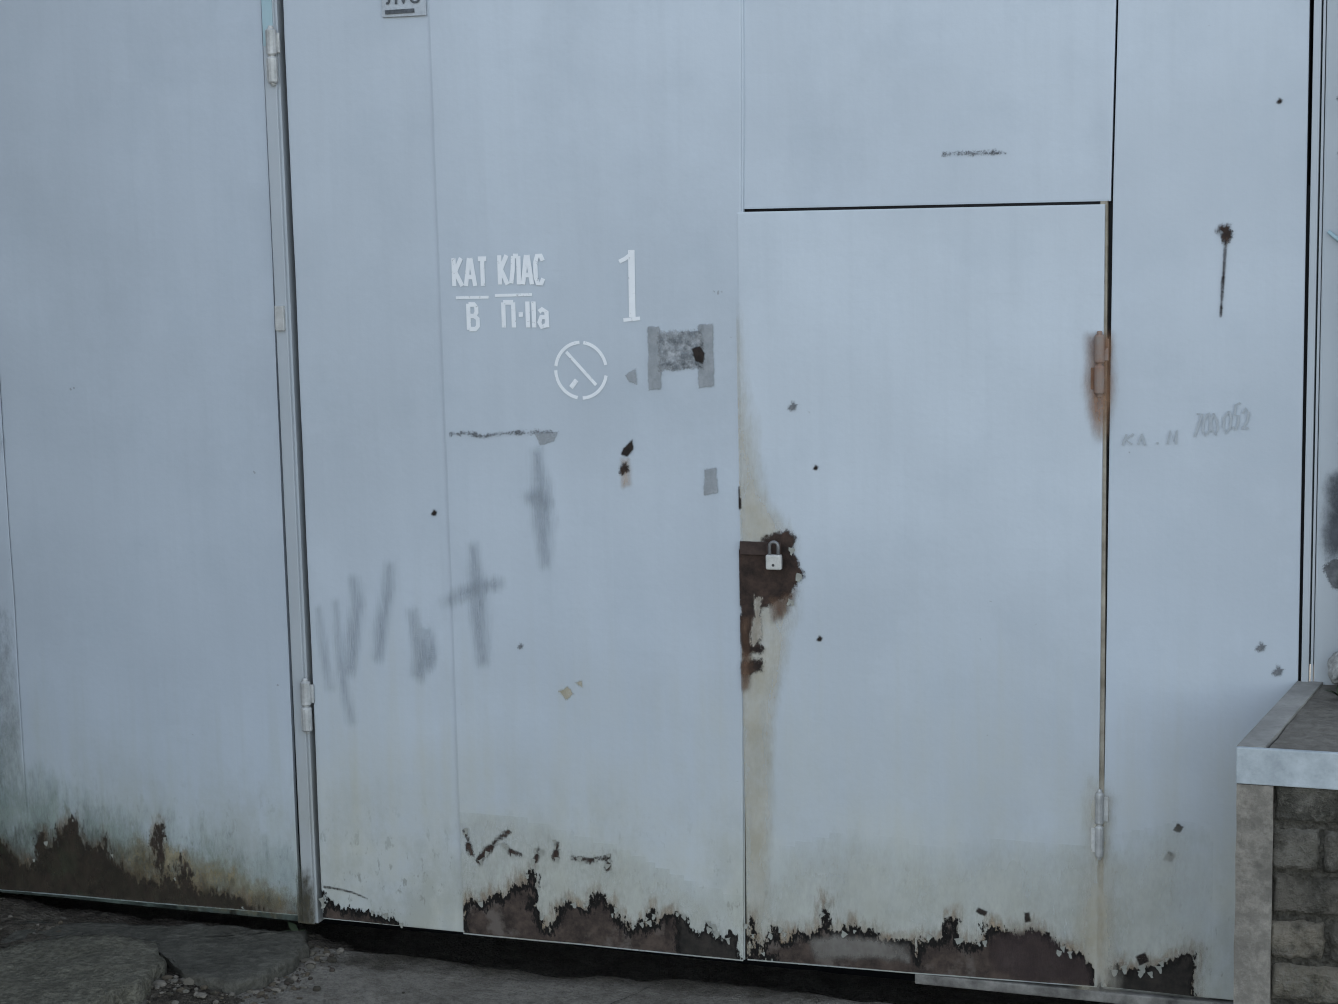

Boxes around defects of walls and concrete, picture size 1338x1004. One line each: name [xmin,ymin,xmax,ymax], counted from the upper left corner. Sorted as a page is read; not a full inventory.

corrosion [1215,224,1233,316]
corrosion [1089,339,1110,425]
corrosion [619,440,633,476]
corrosion [738,486,805,953]
corrosion [0,814,295,914]
peeling [319,890,404,928]
peeling [463,828,1197,997]